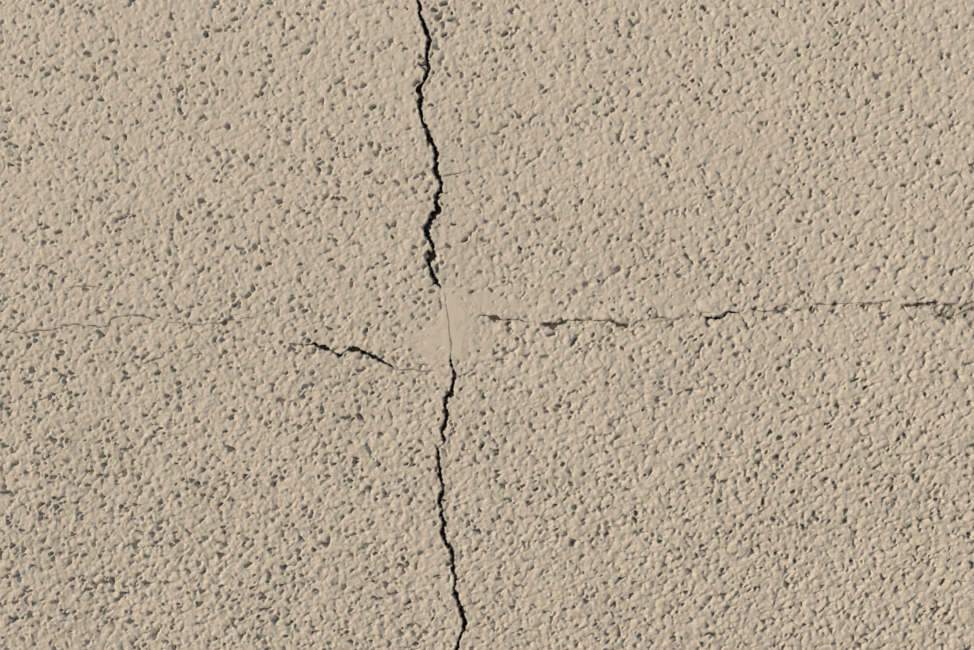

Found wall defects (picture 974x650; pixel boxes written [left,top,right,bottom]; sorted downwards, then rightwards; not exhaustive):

crack [699,300,974,320]
crack [6,309,273,334]
crack [482,315,668,330]